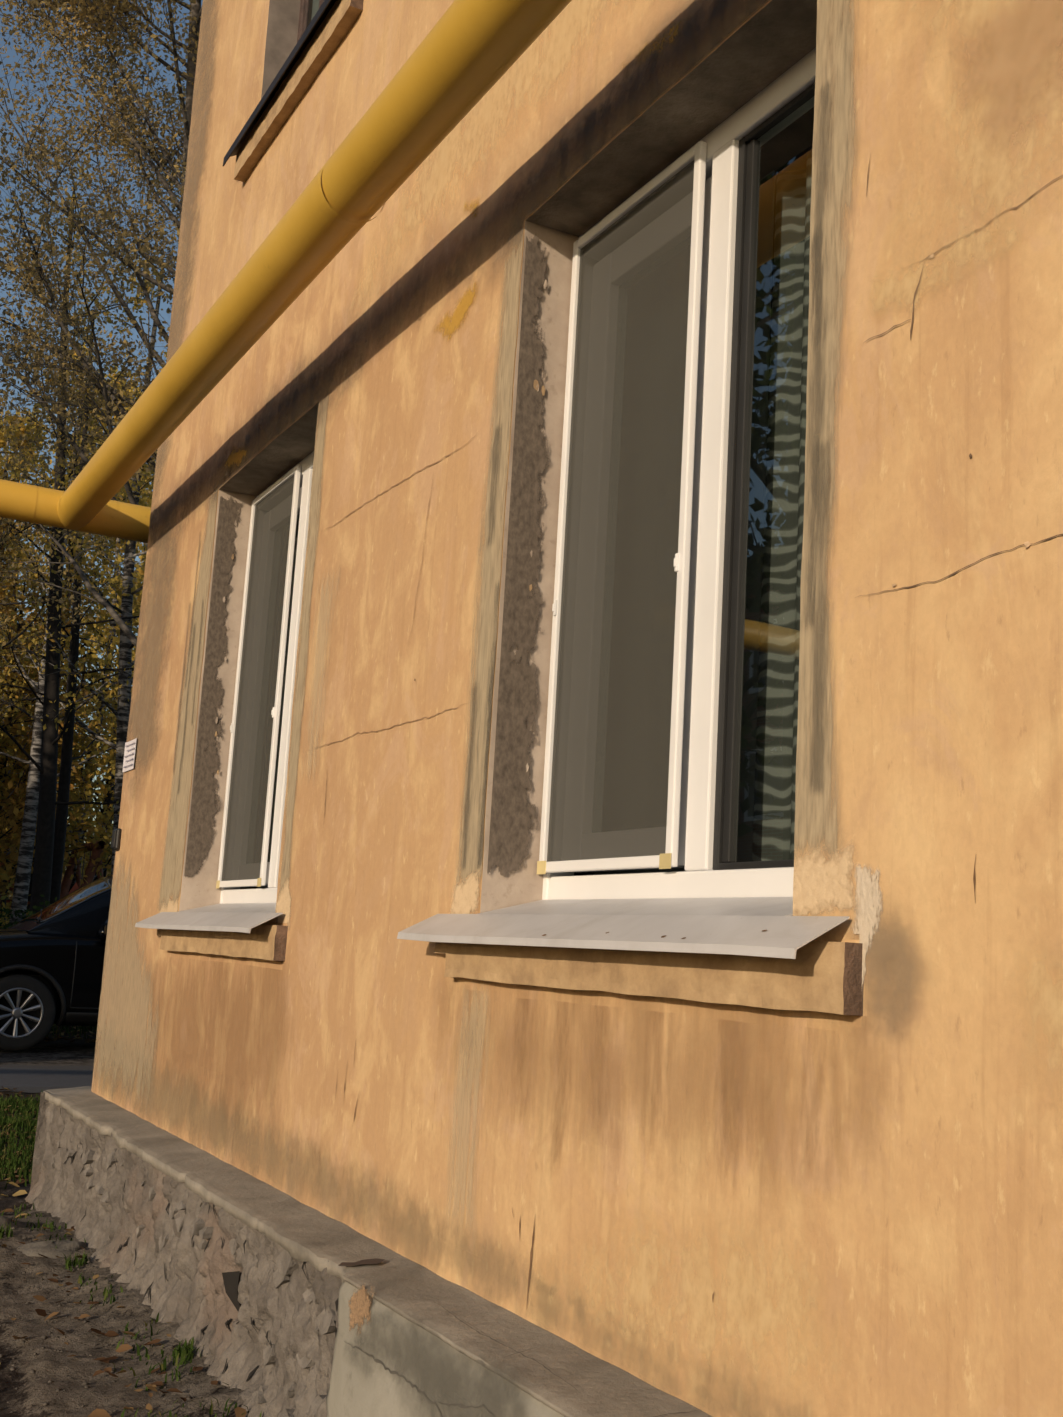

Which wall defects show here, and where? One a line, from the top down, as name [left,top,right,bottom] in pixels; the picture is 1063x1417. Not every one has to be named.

crack [865,175,1063,342]
crack [319,436,475,642]
peeling [487,235,549,876]
damp [447,0,770,886]
damp [794,0,855,856]
crack [857,534,1063,597]
peeling [184,497,242,877]
crack [305,703,468,752]
damp [869,930,912,1008]
crack [334,1298,495,1417]